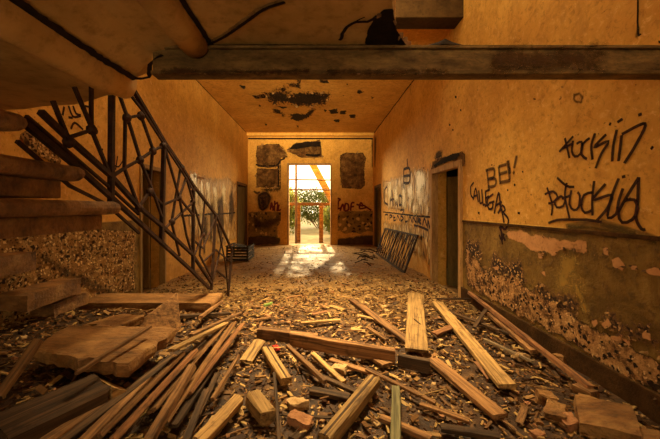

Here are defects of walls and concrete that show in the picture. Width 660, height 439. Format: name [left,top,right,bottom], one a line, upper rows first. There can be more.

flaking render [359,9,406,51]
flaking render [252,80,356,127]
flaking render [255,140,323,192]
flaking render [339,151,366,189]
flaking render [0,229,137,298]
peeling [505,229,587,259]
flaking render [465,247,660,400]